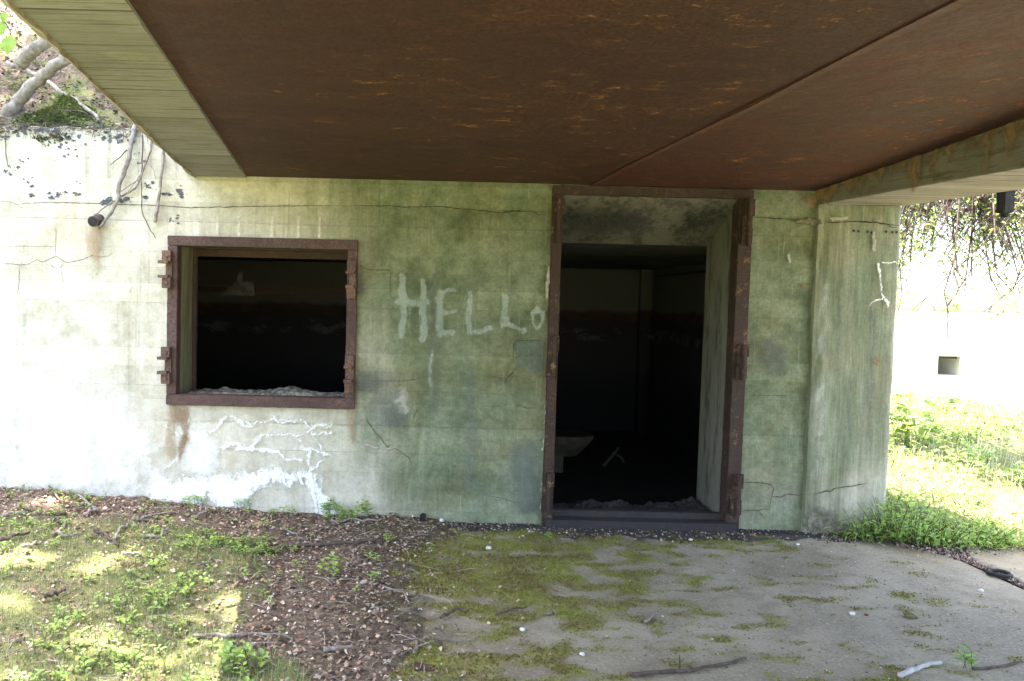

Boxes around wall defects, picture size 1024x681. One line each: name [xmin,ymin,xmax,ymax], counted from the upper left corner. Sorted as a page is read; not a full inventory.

rust [816,119,1022,204]
crack [3,201,544,215]
crack [828,218,899,228]
crack [4,240,112,289]
water stain [0,363,336,516]
rust [173,407,188,457]
crack [741,482,868,518]